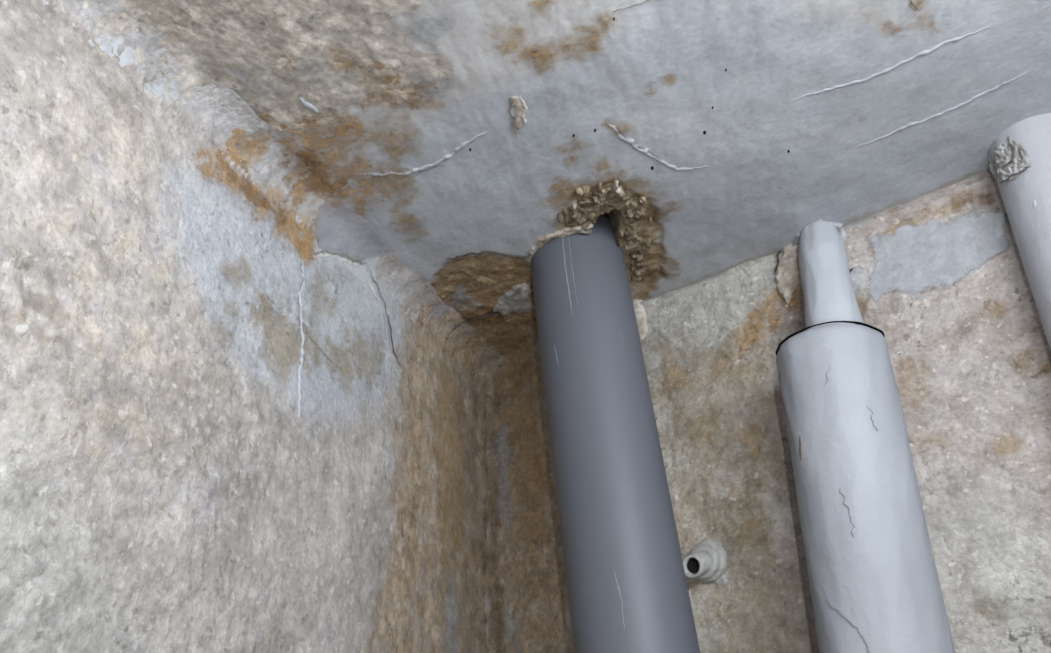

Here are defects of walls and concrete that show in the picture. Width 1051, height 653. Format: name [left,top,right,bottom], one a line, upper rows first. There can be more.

crack [298,250,400,420]
peeling [419,180,652,375]
water stain [353,306,571,653]